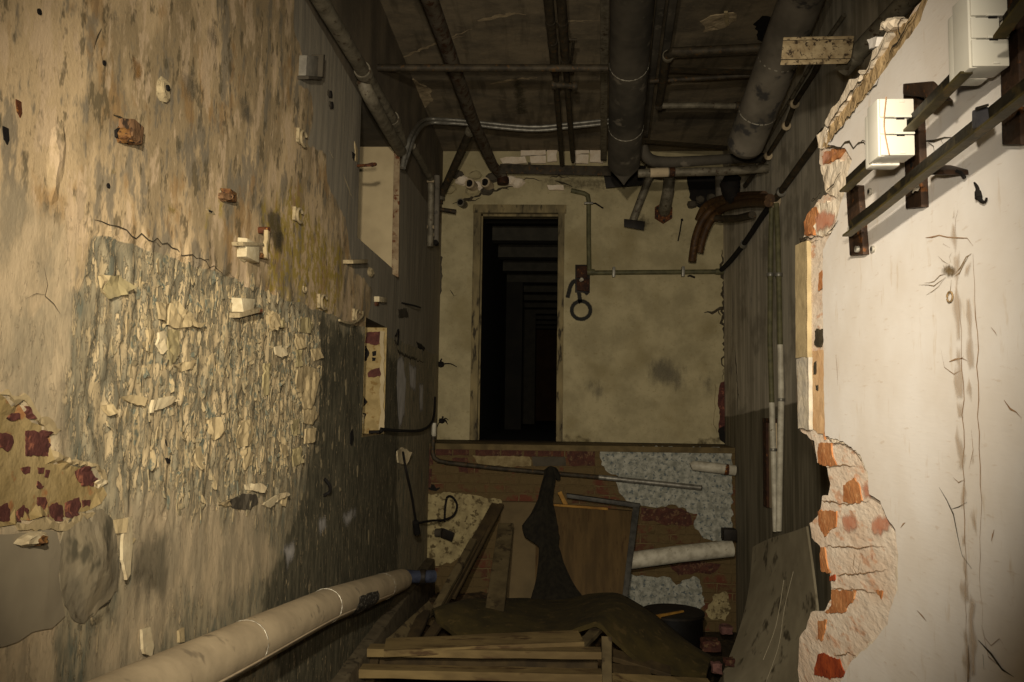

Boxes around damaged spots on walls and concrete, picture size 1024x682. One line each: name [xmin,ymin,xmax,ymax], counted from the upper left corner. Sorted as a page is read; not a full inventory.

crack [827,140,865,149]
crack [94,219,235,278]
spalling [0,389,108,531]
peeling [98,252,367,524]
spalling [364,331,385,434]
peeling [427,382,734,566]
spalling [795,0,928,680]
crack [926,211,1012,682]
peeling [628,560,731,621]